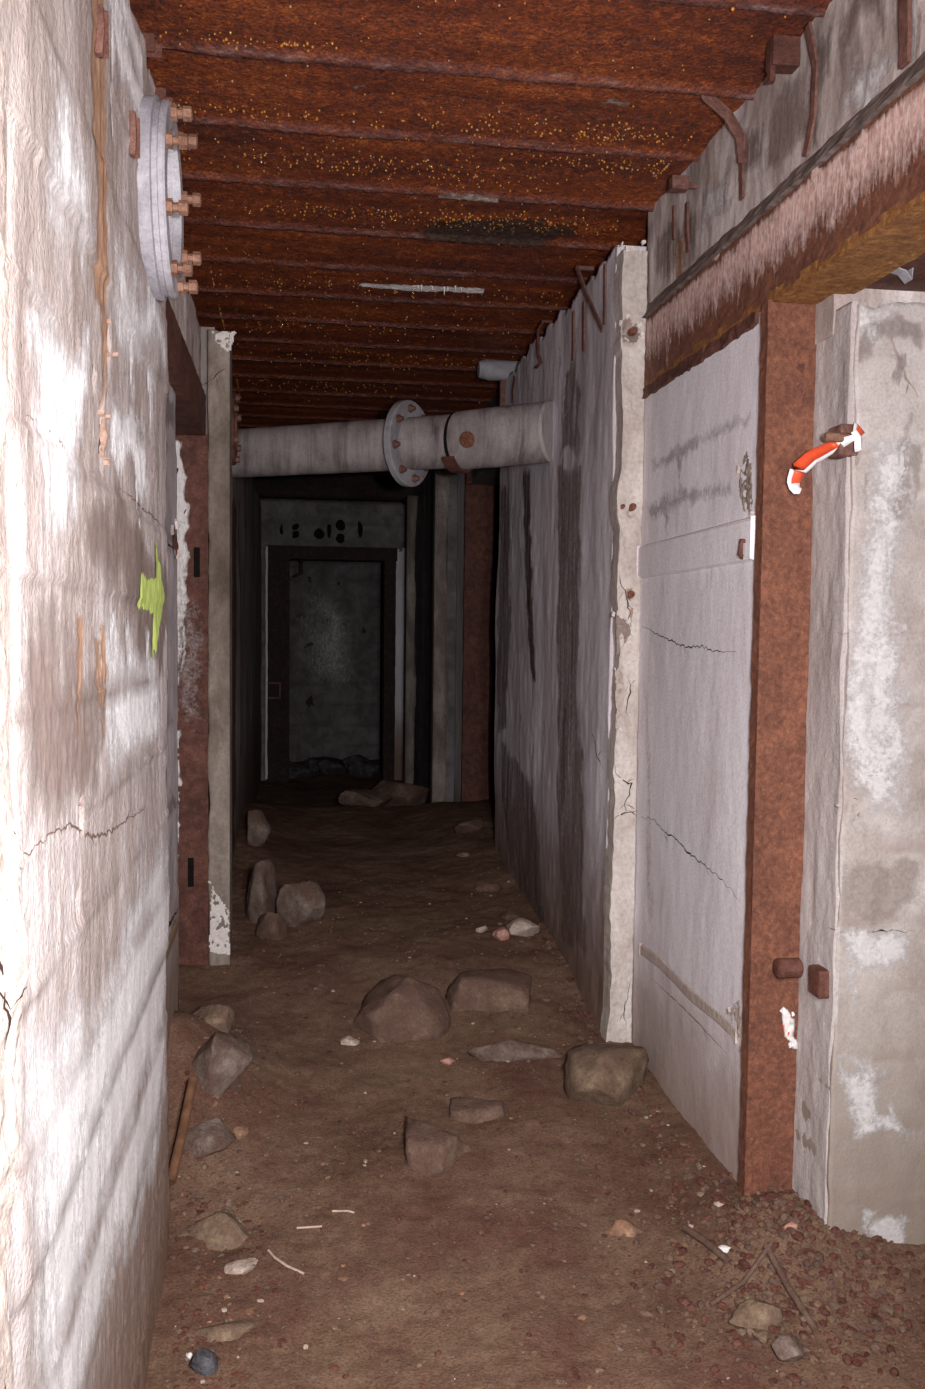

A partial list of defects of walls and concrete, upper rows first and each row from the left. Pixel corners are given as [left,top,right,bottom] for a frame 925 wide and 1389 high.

rust [92,0,110,410]
crack [619,580,735,654]
crack [23,805,146,855]